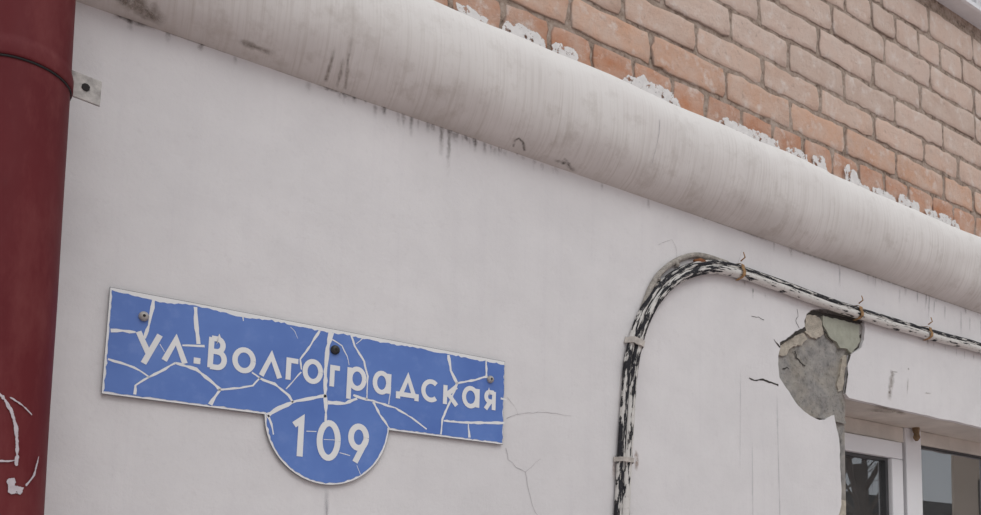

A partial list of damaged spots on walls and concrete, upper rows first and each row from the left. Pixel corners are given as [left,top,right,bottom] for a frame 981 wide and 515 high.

peeling [623,74,681,107]
peeling [718,117,828,171]
peeling [844,164,960,229]
flaking render [749,309,862,424]